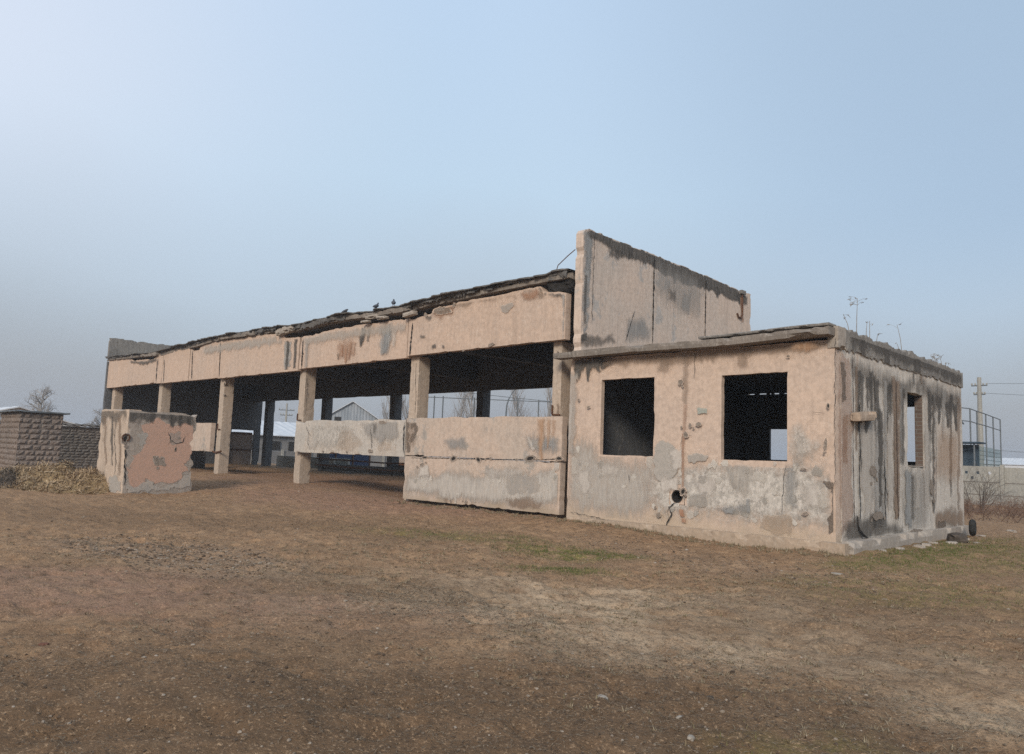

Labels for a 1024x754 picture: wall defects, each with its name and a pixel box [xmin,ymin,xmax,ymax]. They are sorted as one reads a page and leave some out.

water stain [581,231,744,341]
peeling [108,418,193,493]
peeling [405,374,833,533]
water stain [845,337,963,539]